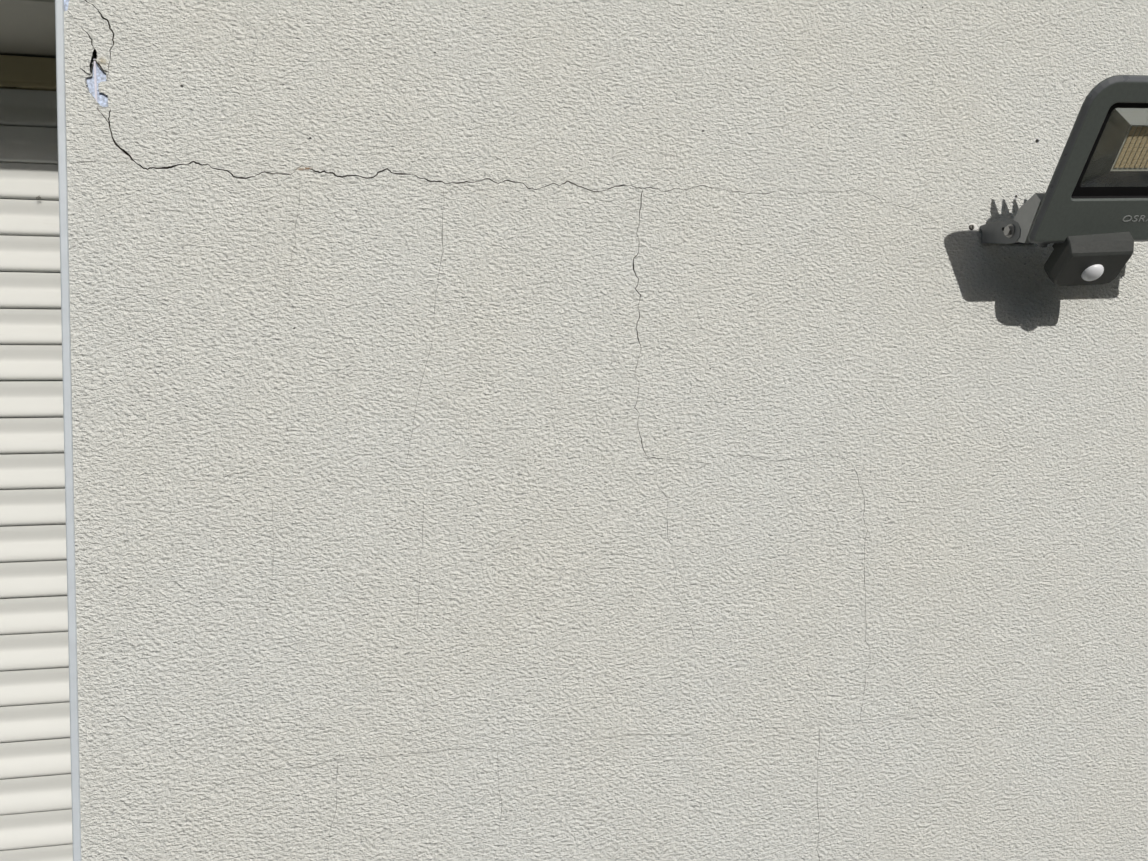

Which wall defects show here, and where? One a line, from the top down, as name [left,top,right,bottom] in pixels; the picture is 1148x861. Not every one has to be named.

crack [68,0,114,79]
crack [69,107,938,636]
crack [214,454,1047,861]